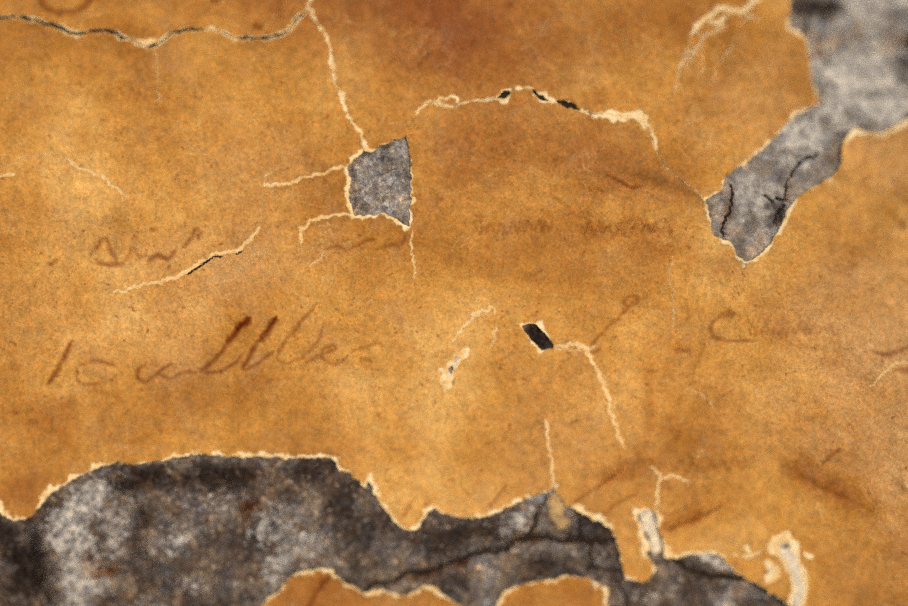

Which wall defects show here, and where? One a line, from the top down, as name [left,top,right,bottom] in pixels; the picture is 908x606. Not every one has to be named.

crack [0,8,306,48]
crack [497,90,581,110]
peeling [768,0,908,171]
crack [720,184,734,236]
peeling [721,172,780,228]
peeling [439,347,470,393]
peeling [40,477,135,606]
peeling [208,488,329,584]
peeling [500,506,535,537]
peeling [547,490,574,530]
peeling [639,509,664,560]
peeling [694,530,813,606]